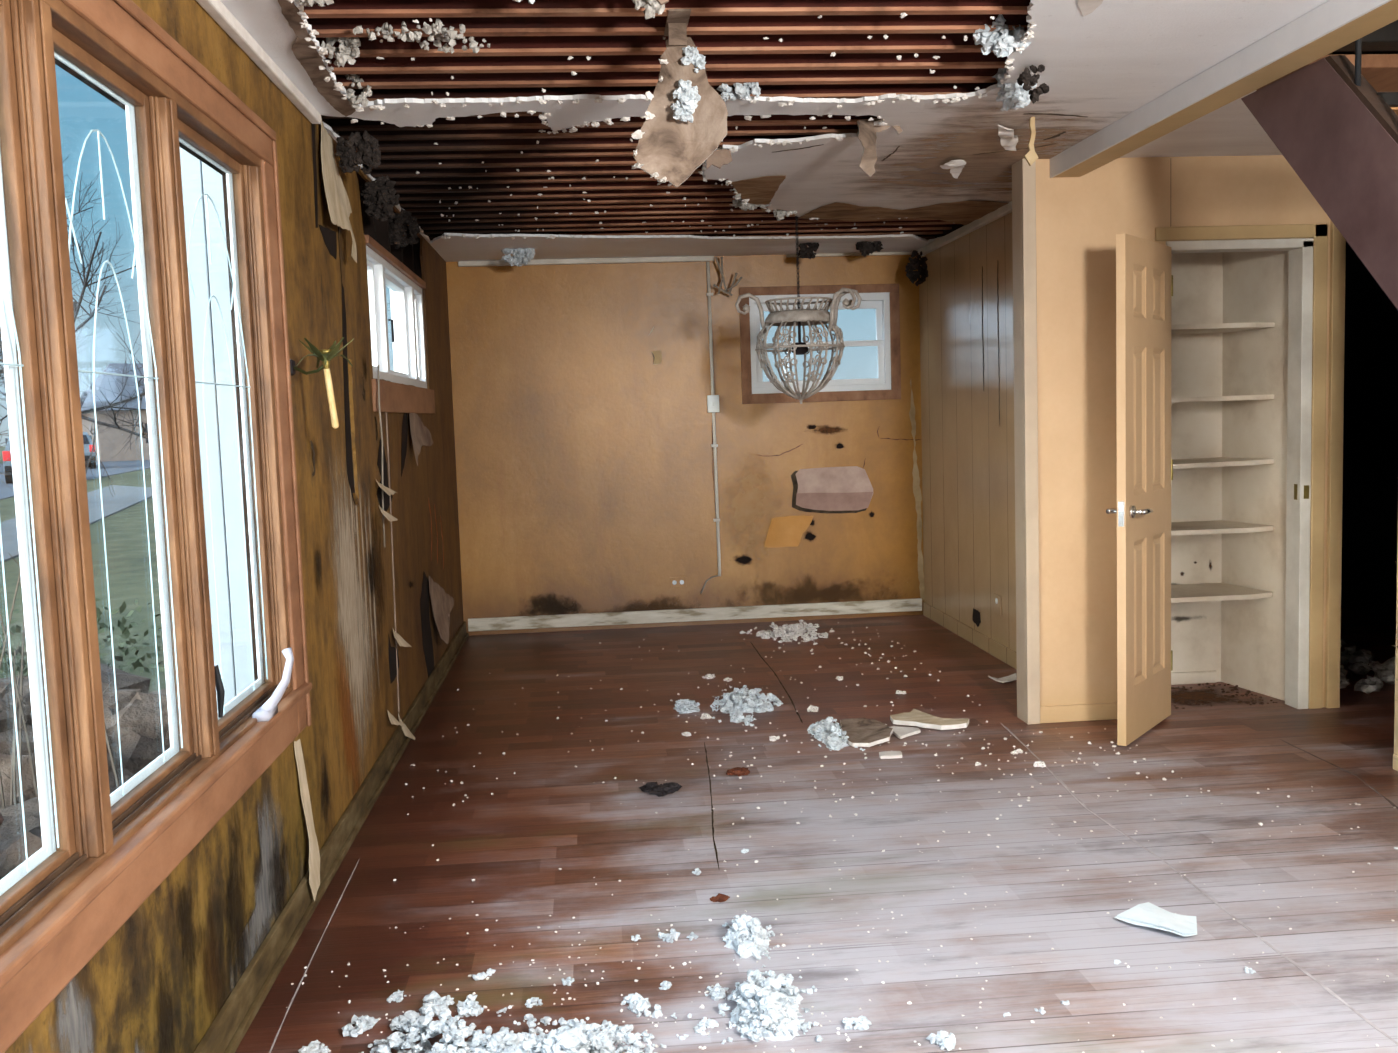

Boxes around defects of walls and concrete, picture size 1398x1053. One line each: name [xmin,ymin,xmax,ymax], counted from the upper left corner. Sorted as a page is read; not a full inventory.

flaking render [287,0,385,124]
peeling [318,121,357,263]
flaking render [413,59,669,183]
peeling [940,160,966,178]
peeling [998,125,1018,151]
peeling [428,498,454,644]
mould [527,595,578,616]
water stain [615,599,691,612]
water stain [762,579,860,604]
water stain [178,800,289,1010]
water stain [58,980,92,1053]
water stain [158,978,173,1038]